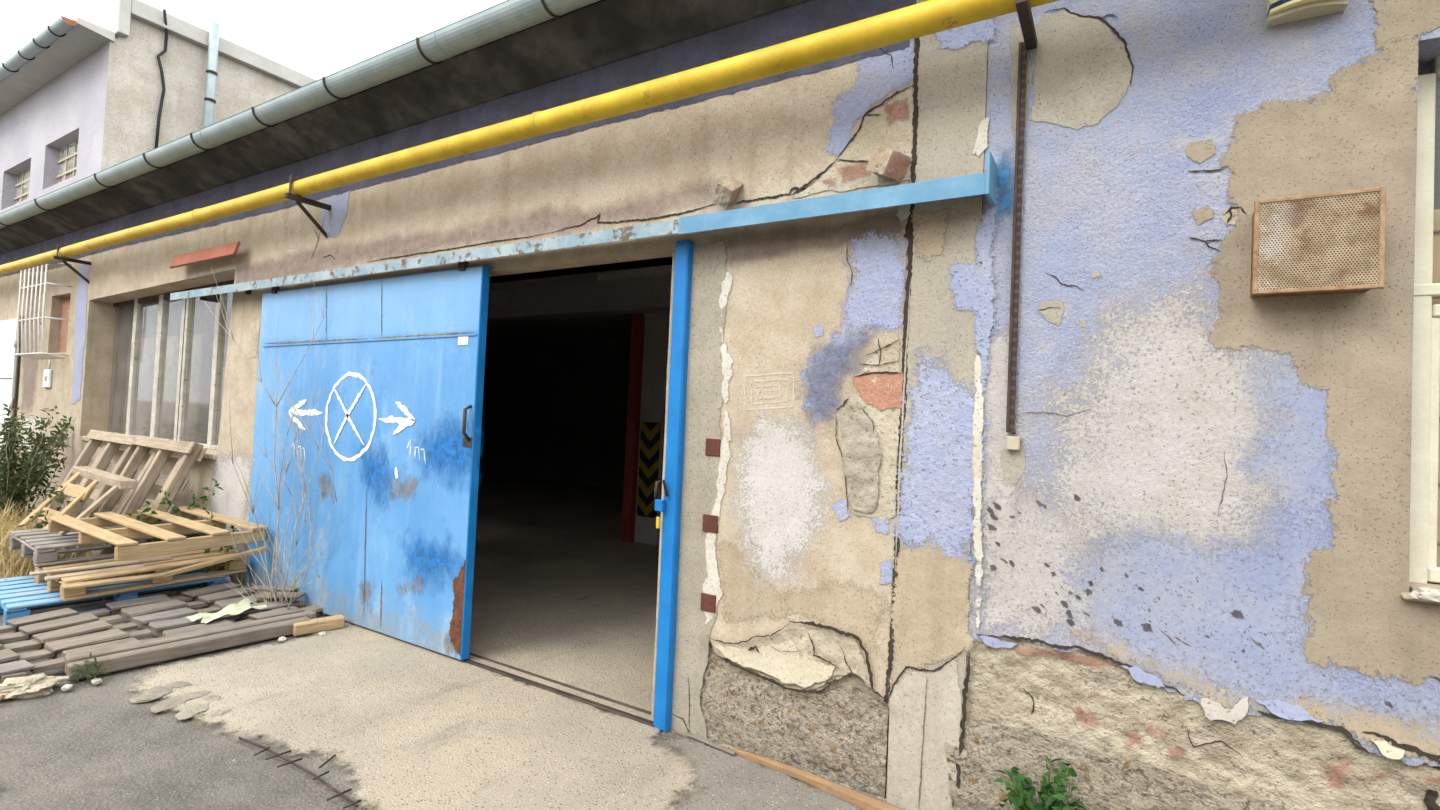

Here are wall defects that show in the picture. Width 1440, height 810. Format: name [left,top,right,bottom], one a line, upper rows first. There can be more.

crack [369,187,808,262]
peeling [702,0,1440,810]
crack [711,37,1440,808]